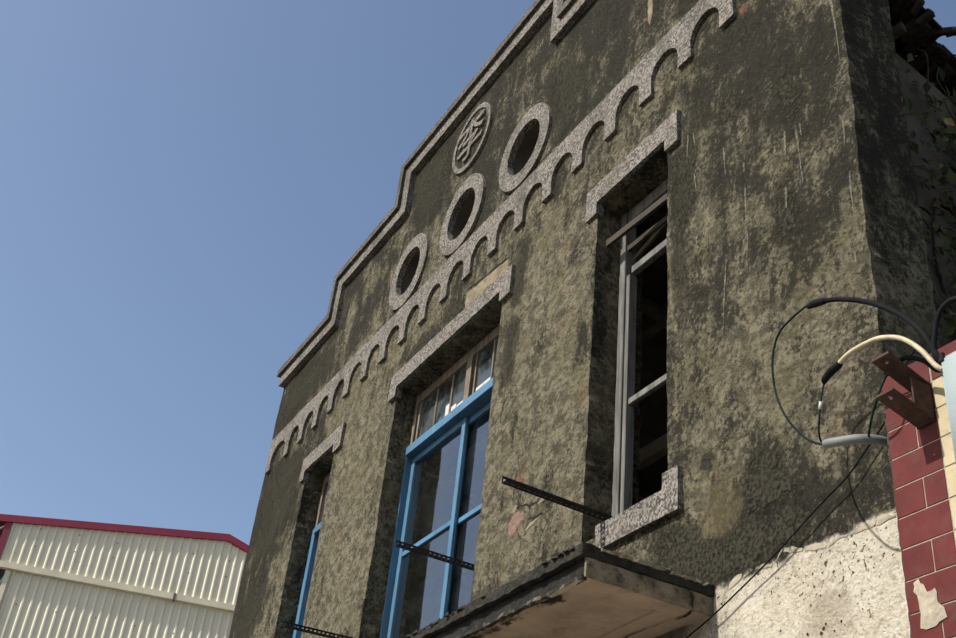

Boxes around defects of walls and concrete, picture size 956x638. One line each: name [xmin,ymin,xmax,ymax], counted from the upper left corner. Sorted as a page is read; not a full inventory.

spalling [508,505,539,538]
damp [656,444,809,585]
spalling [913,579,947,629]